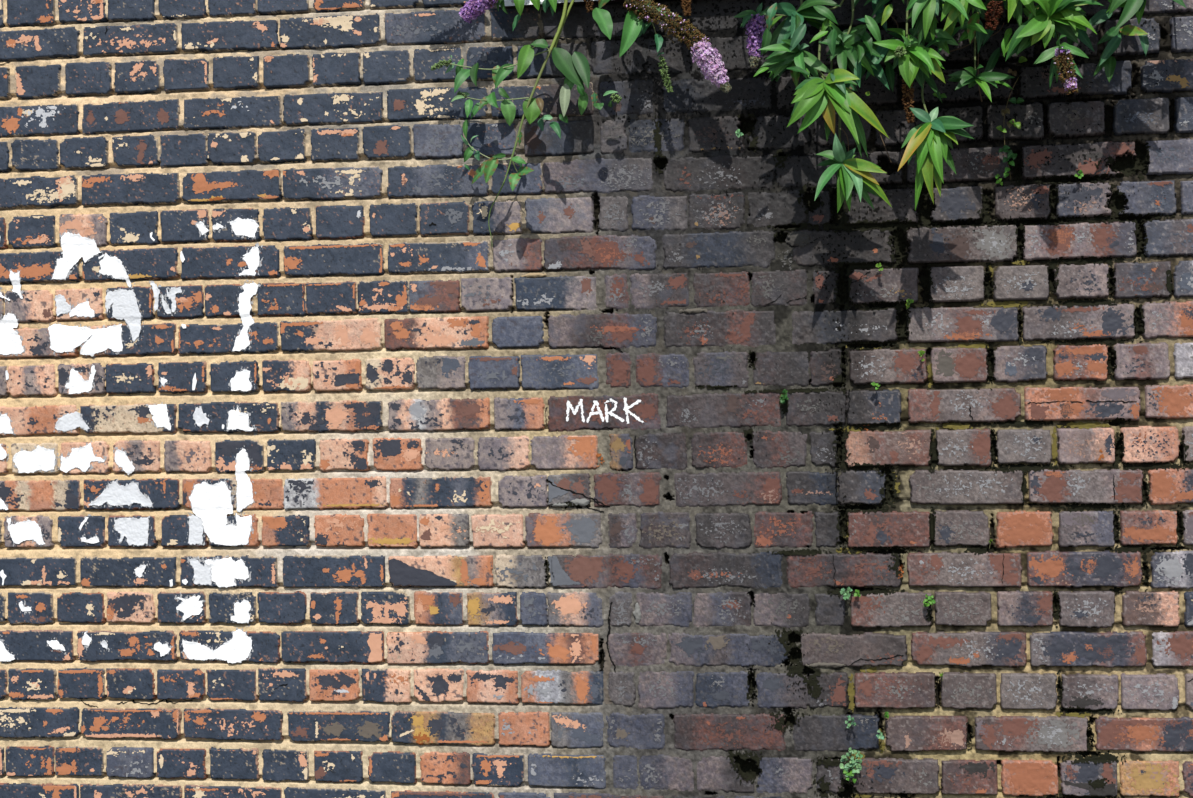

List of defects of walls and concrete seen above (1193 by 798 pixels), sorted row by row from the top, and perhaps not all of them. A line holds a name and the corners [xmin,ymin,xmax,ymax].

peeling [6,0,103,51]
peeling [307,0,362,36]
peeling [0,262,55,280]
damp [560,0,1148,513]
peeling [149,289,231,352]
peeling [145,365,187,392]
peeling [390,484,466,540]
peeling [16,566,91,612]
peeling [334,596,342,624]
peeling [170,615,203,659]
crack [606,602,616,672]